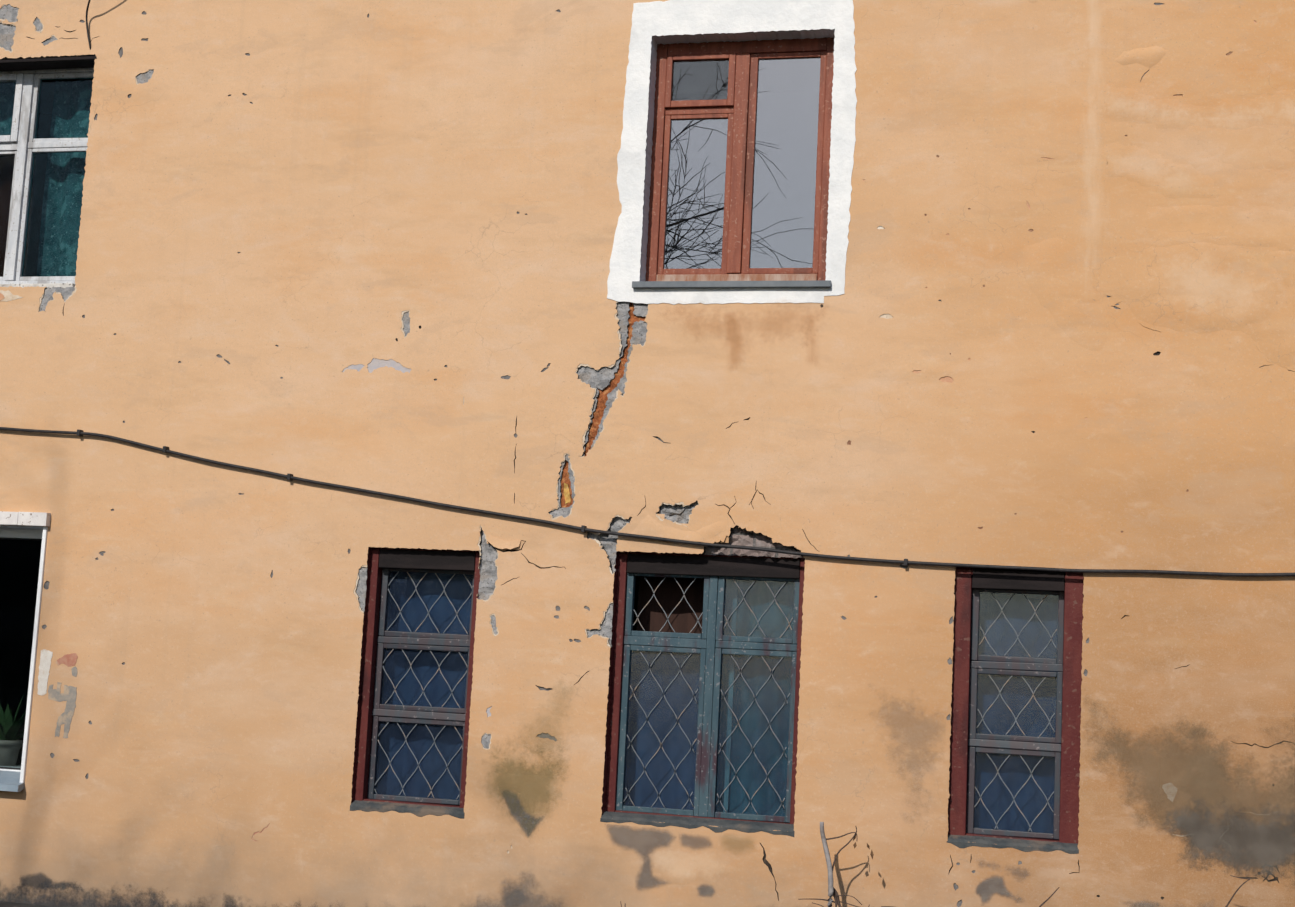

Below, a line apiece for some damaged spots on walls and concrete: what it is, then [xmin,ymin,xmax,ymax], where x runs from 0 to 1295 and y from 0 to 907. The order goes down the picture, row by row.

flaking render [0,4,99,53]
flaking render [128,69,154,98]
flaking render [39,286,77,316]
crack [548,301,649,520]
flaking render [587,499,699,575]
flaking render [702,496,804,558]
flaking render [477,525,526,636]
water stain [493,758,561,836]
water stain [1096,723,1295,883]
water stain [0,874,203,907]
water stain [608,825,736,896]
water stain [949,855,1011,907]